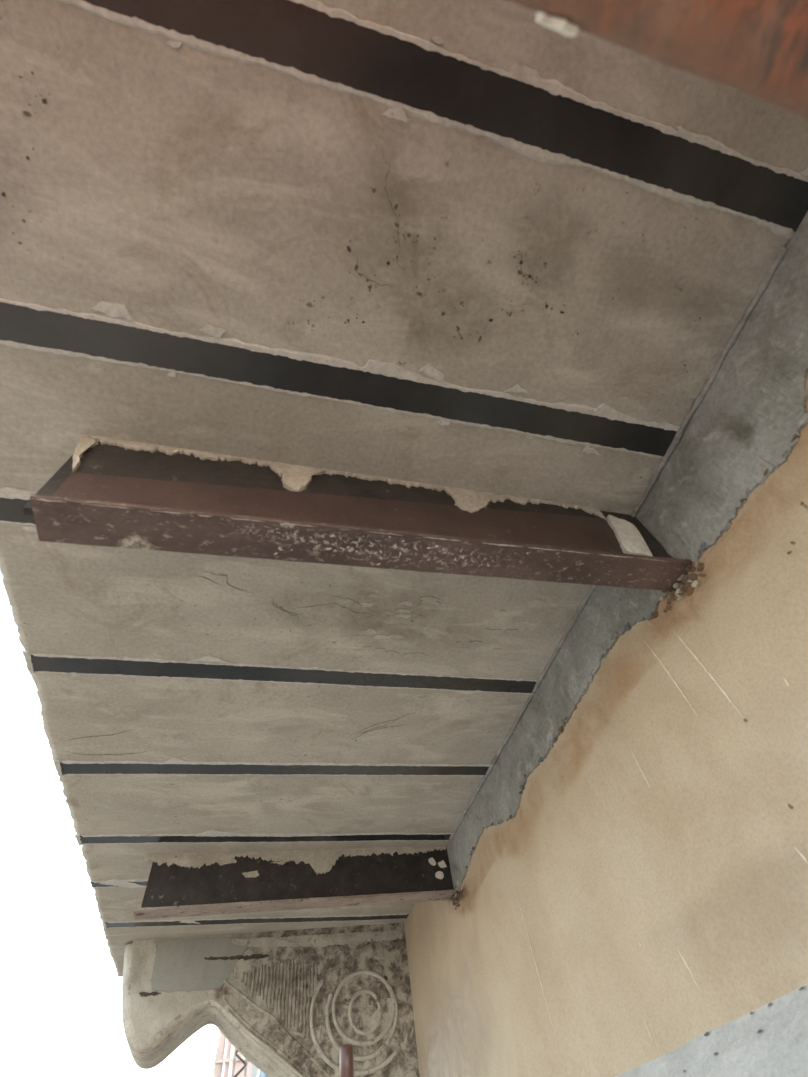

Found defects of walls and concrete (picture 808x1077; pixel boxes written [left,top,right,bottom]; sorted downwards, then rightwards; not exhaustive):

flaking render [535,11,579,37]
peeling [505,63,546,86]
peeling [362,359,445,382]
peeling [594,403,660,427]
peeling [72,434,98,473]
peeling [270,461,328,492]
peeling [454,489,506,513]
peeling [231,518,494,566]
crack [196,571,379,617]
spalling [645,542,708,620]
peeling [216,857,259,878]
peeling [428,857,447,879]